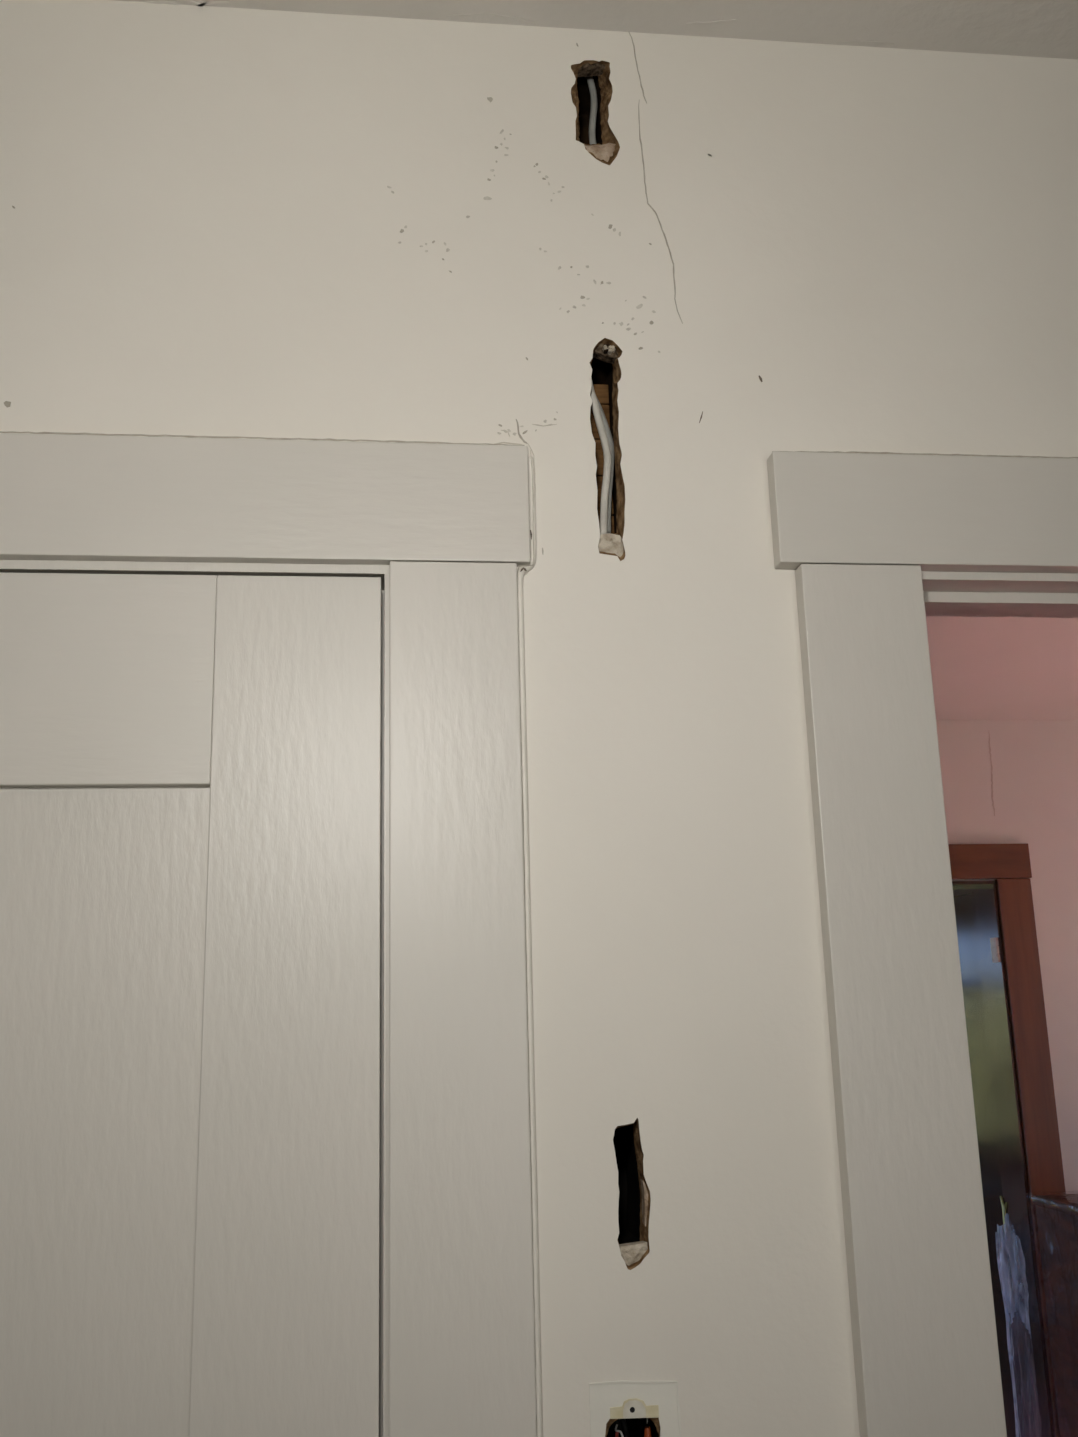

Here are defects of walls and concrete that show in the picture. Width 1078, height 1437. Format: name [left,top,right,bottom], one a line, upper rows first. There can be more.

crack [629,32,683,324]